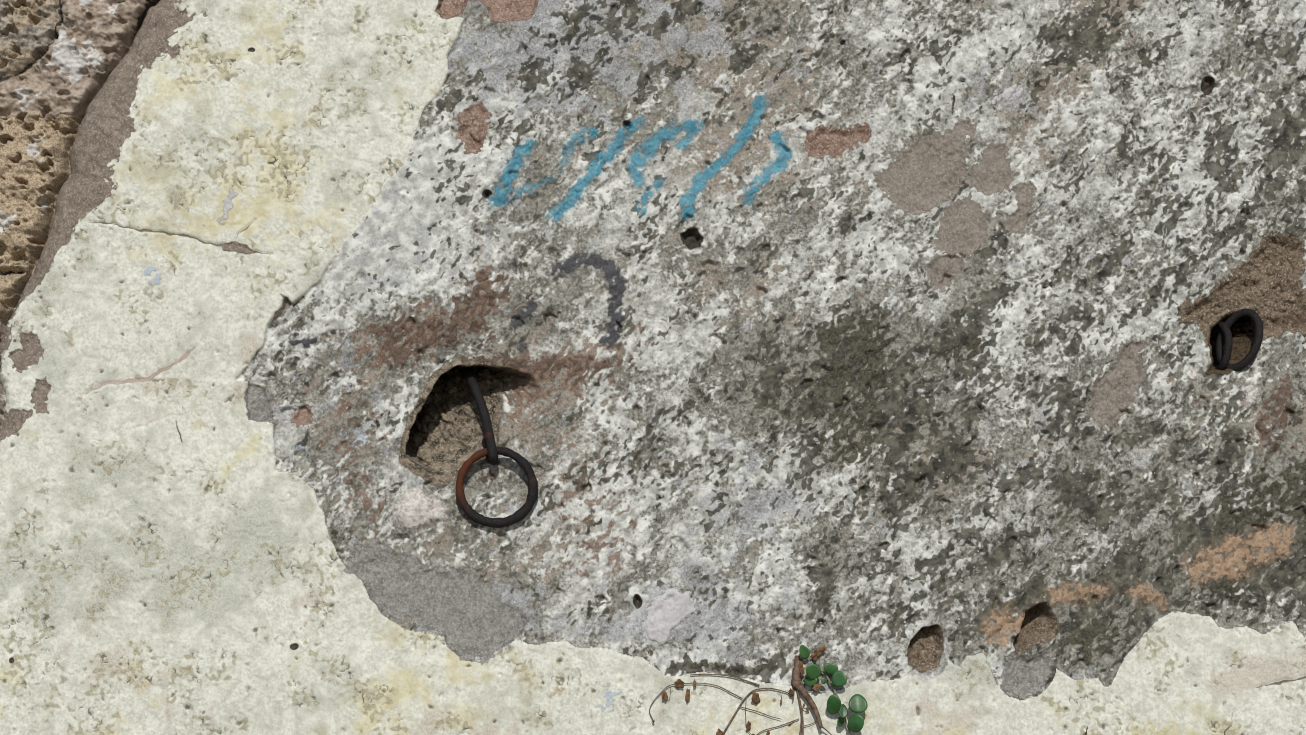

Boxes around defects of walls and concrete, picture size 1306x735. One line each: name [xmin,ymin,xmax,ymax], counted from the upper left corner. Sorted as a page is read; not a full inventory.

crack [93,220,268,254]
spalling [225,0,1306,700]
crack [1261,676,1306,686]